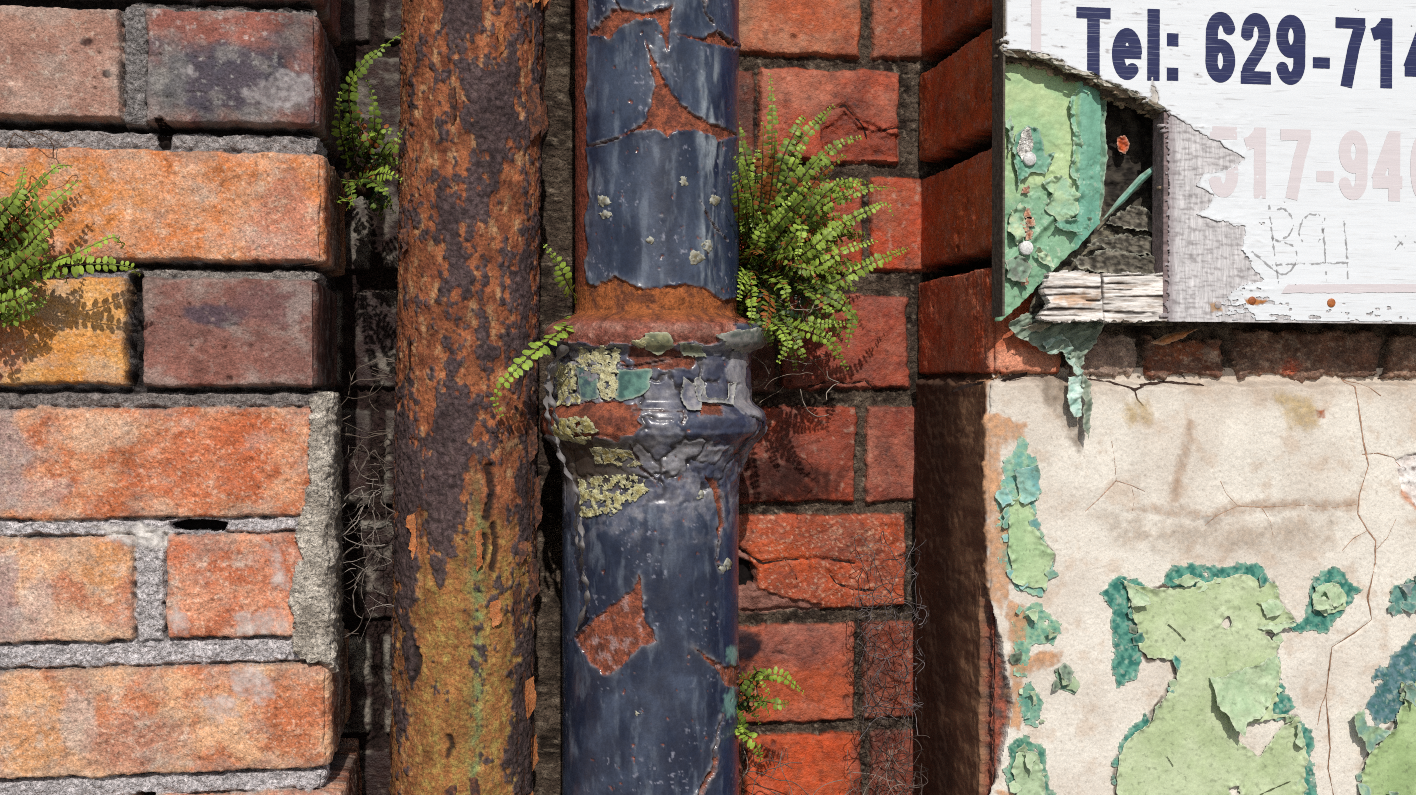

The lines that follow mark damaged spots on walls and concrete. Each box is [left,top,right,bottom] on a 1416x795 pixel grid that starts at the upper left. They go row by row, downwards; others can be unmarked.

peeling [590,7,737,141]
peeling [680,376,737,417]
peeling [1008,312,1104,439]
crack [1087,378,1204,406]
crack [1086,444,1144,511]
peeling [576,575,656,676]
crack [738,548,873,607]
peeling [980,435,1080,795]
peeling [1099,561,1363,795]
crack [1205,377,1401,795]
peeling [1354,633,1416,795]
peeling [1388,578,1416,616]